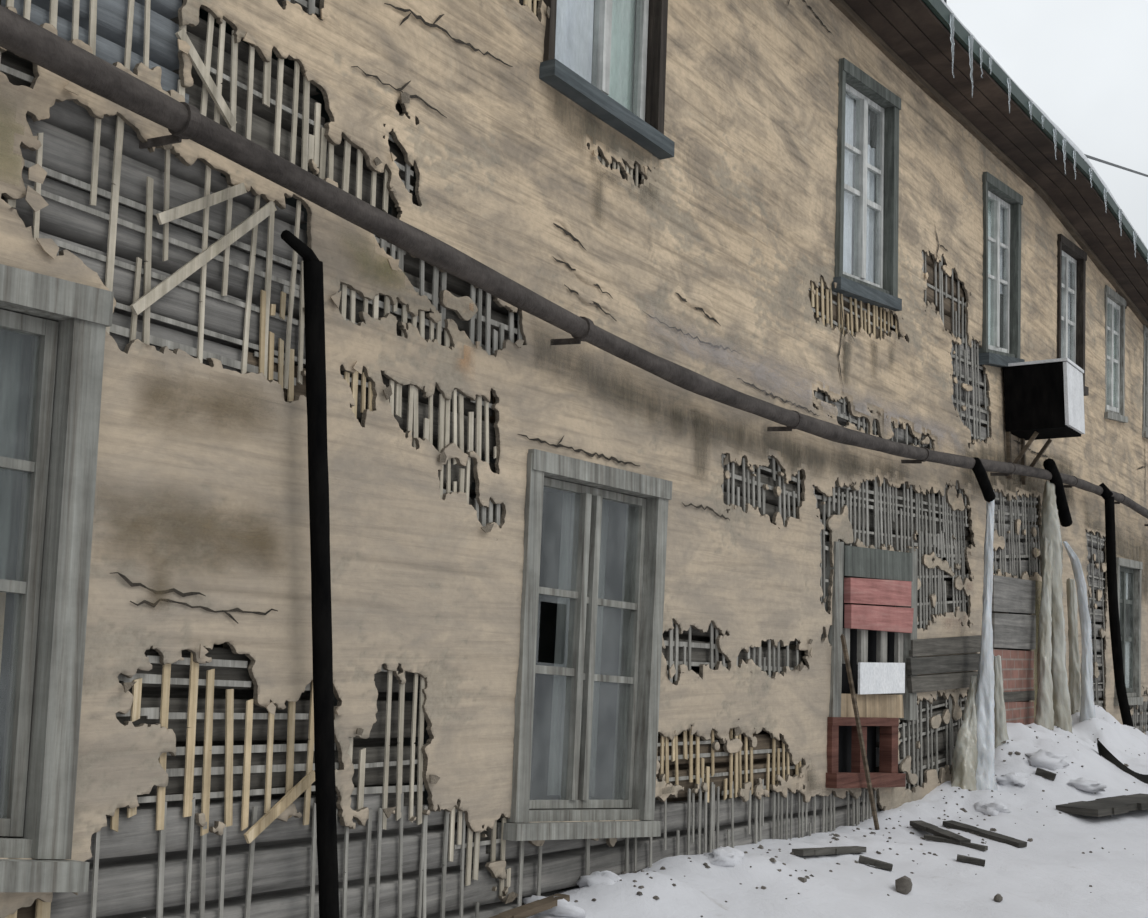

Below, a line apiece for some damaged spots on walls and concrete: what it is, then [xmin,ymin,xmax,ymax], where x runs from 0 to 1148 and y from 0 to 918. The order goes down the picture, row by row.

peeling [0,0,419,218]
crack [384,3,513,67]
crack [788,0,831,33]
peeling [1,81,308,402]
peeling [330,234,524,355]
peeling [921,251,989,444]
peeling [340,361,500,533]
crack [517,434,640,466]
crack [110,572,278,623]
peeling [721,454,975,629]
peeling [5,644,319,918]
peeling [335,664,886,918]